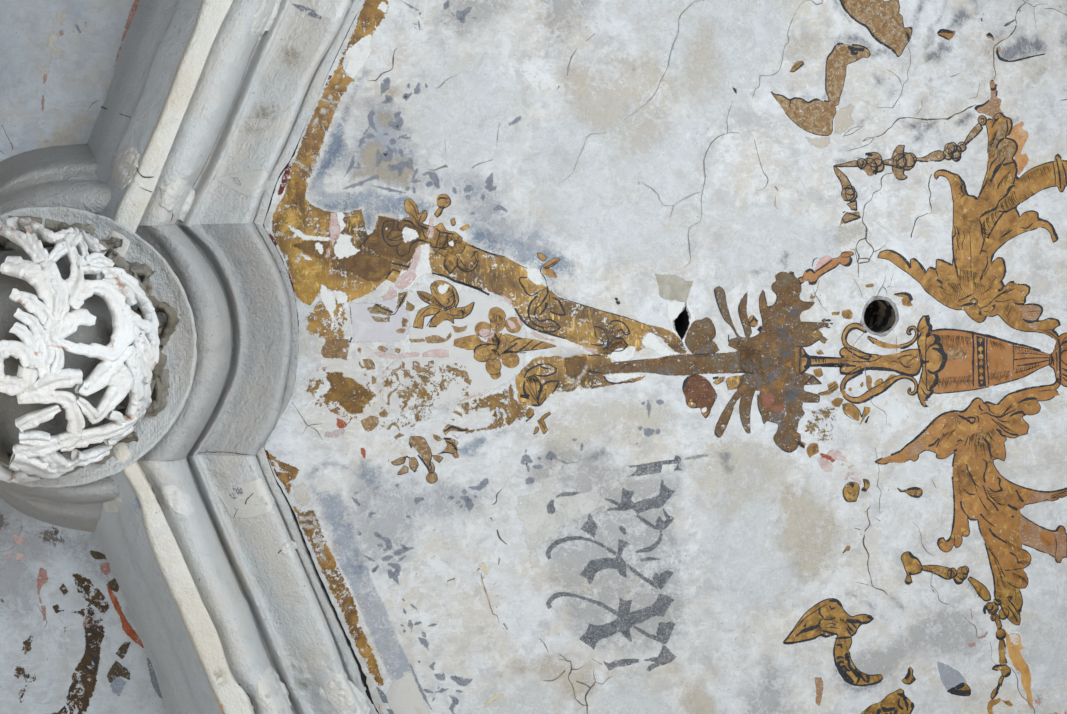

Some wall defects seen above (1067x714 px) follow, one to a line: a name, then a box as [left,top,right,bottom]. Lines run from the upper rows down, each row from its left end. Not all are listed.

crack [843,0,1067,151]
crack [643,0,823,267]
flaking render [287,212,360,261]
crack [853,173,893,297]
crack [911,174,932,237]
flaking render [319,285,348,328]
spalling [607,274,695,383]
spalling [832,284,913,337]
peeling [304,358,469,431]
crack [855,449,888,595]
peeling [52,573,130,714]
crack [540,639,612,714]